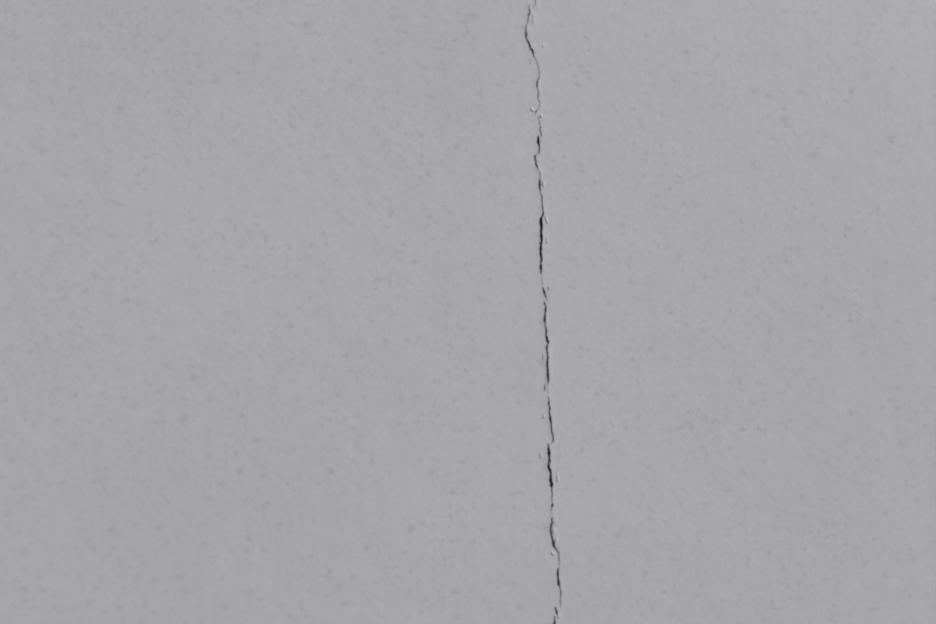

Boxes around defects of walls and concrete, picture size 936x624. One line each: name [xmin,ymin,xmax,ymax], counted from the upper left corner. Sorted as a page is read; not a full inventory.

crack [525,0,562,624]